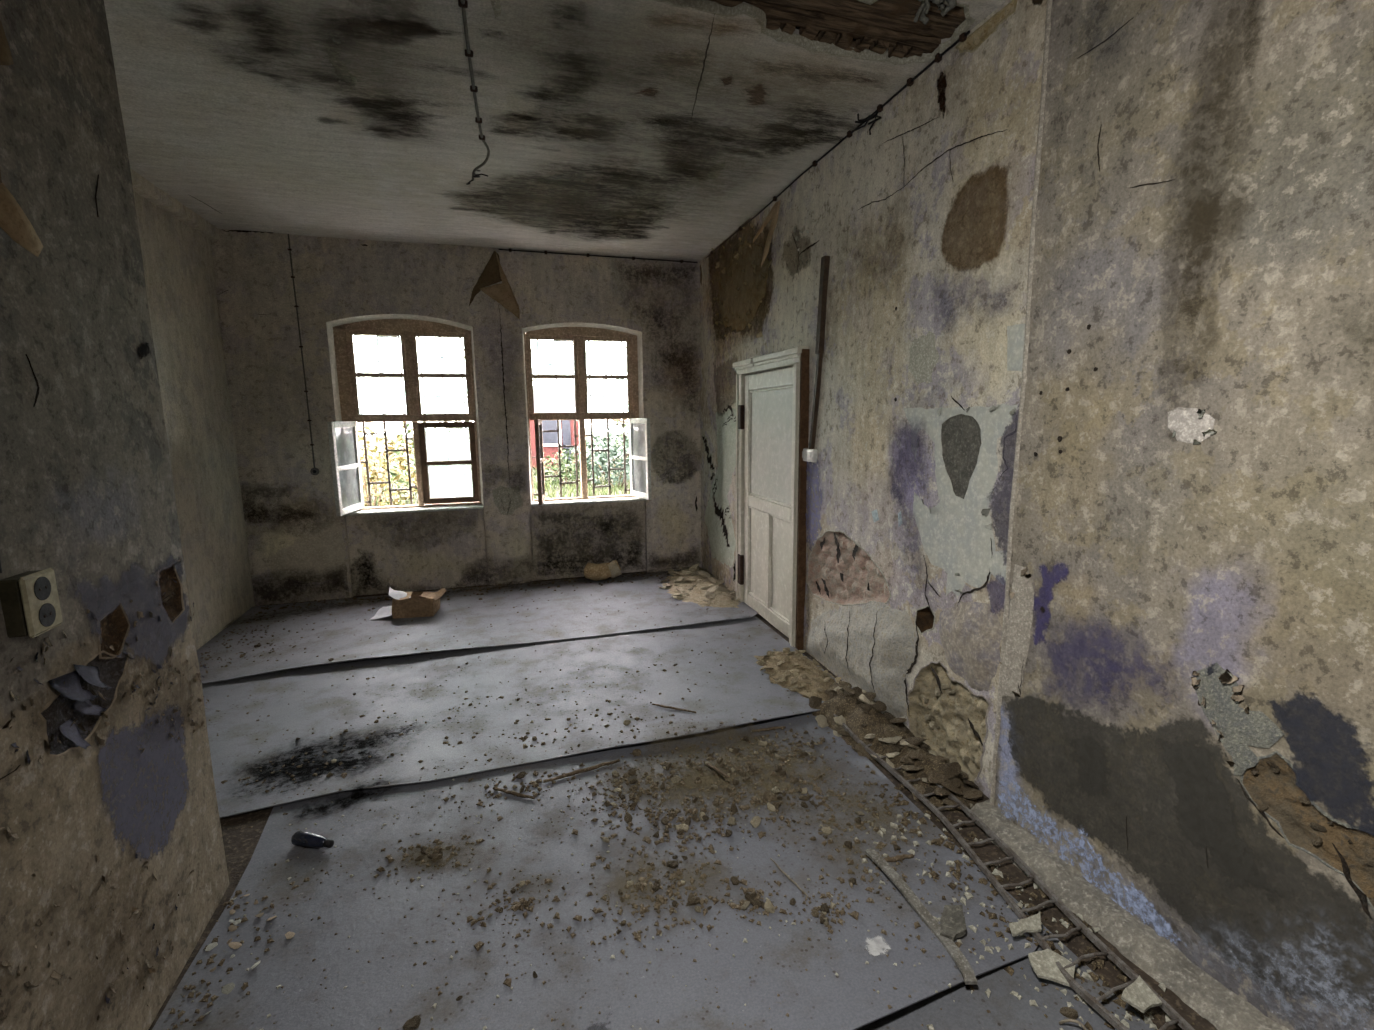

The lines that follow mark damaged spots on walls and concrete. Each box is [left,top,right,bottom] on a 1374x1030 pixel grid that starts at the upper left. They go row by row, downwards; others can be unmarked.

leakage [238,2,448,133]
leakage [496,54,608,139]
leakage [452,110,845,239]
leakage [942,166,1008,271]
flaking render [1168,407,1217,445]
leakage [466,510,697,582]
crack [695,405,736,582]
spalling [806,530,891,606]
peeling [898,404,1035,785]
flaking render [2,558,210,765]
flaking render [1191,662,1374,913]
leakage [998,695,1374,1030]